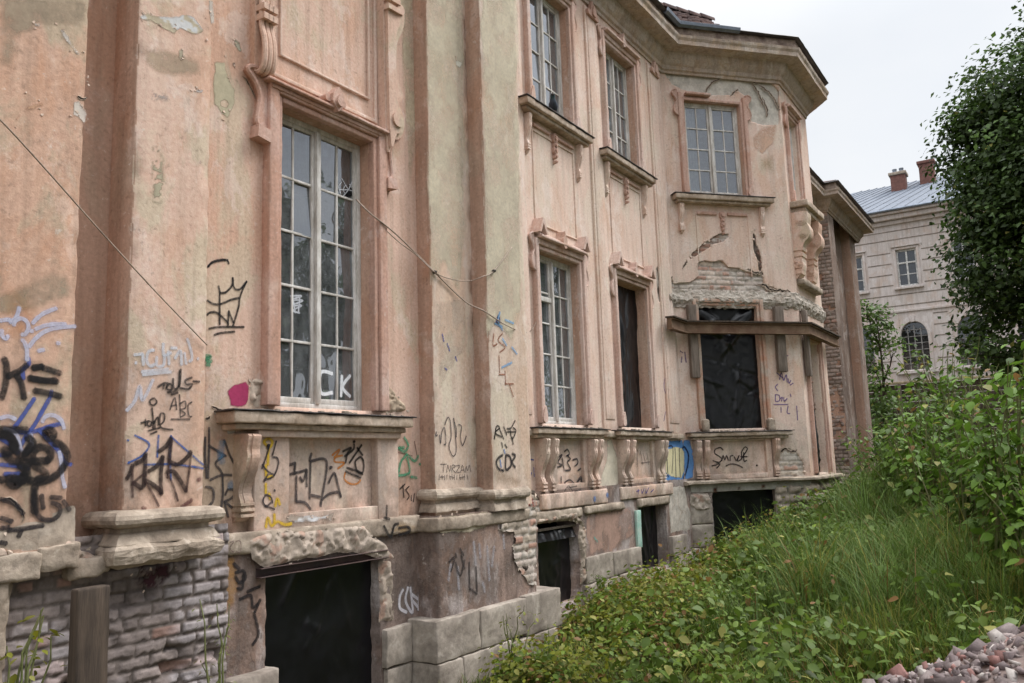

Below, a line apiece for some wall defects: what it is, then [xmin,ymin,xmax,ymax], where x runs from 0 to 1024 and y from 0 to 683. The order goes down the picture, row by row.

peeling [141,1,218,41]
peeling [70,101,88,122]
peeling [190,55,236,121]
spalling [665,73,782,153]
spalling [672,232,777,293]
spalling [439,490,633,585]